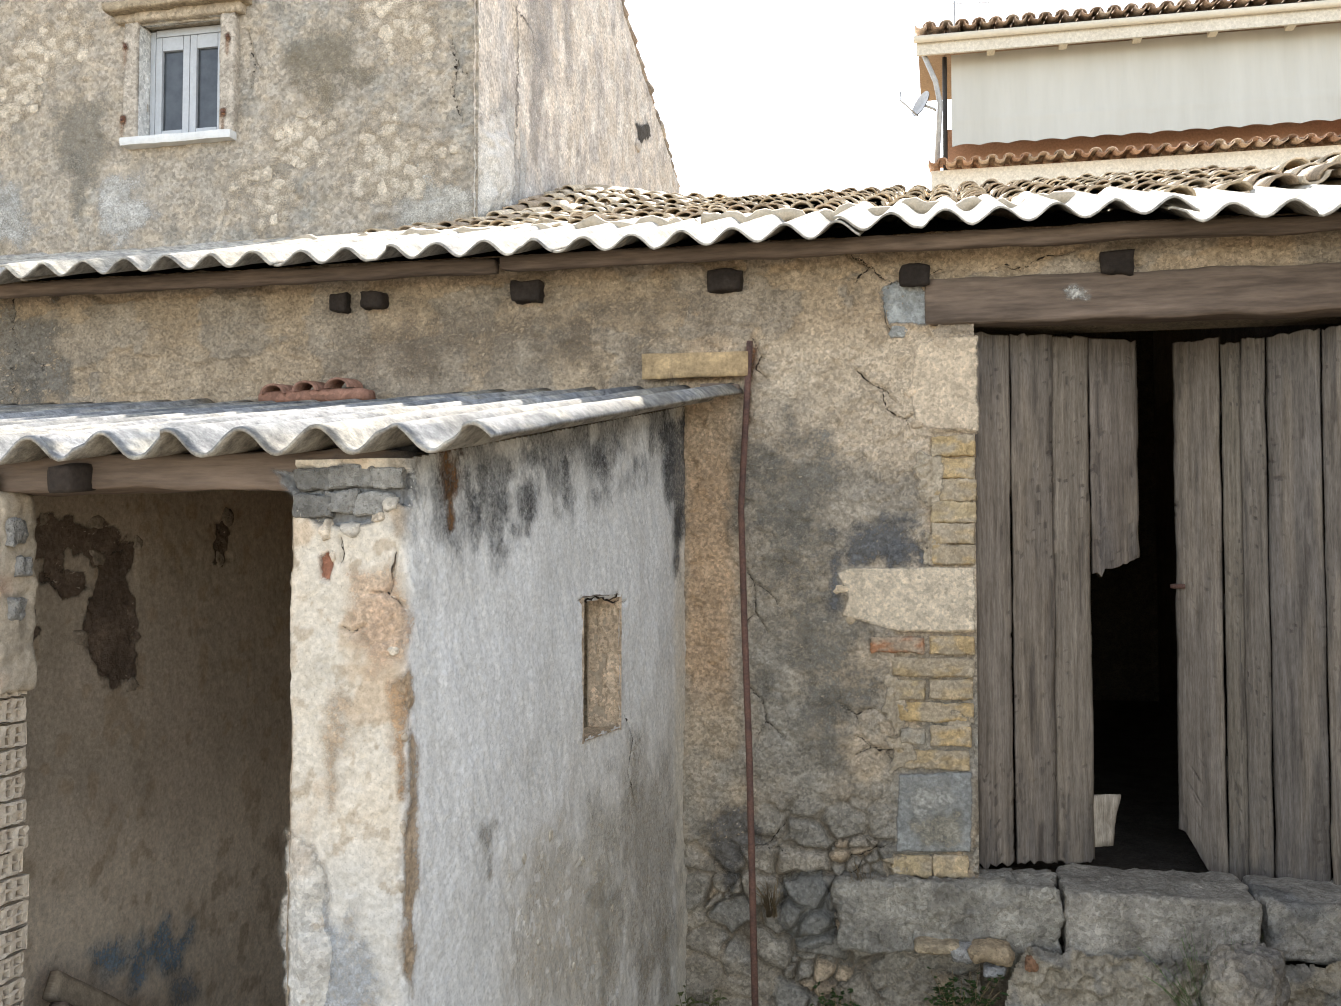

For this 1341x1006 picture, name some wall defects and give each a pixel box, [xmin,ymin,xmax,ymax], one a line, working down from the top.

flaking render [212,507,234,568]
spalling [275,470,416,580]
water stain [432,444,533,553]
water stain [523,419,629,493]
water stain [649,409,686,575]
flaking render [35,512,143,692]
crack [842,705,894,756]